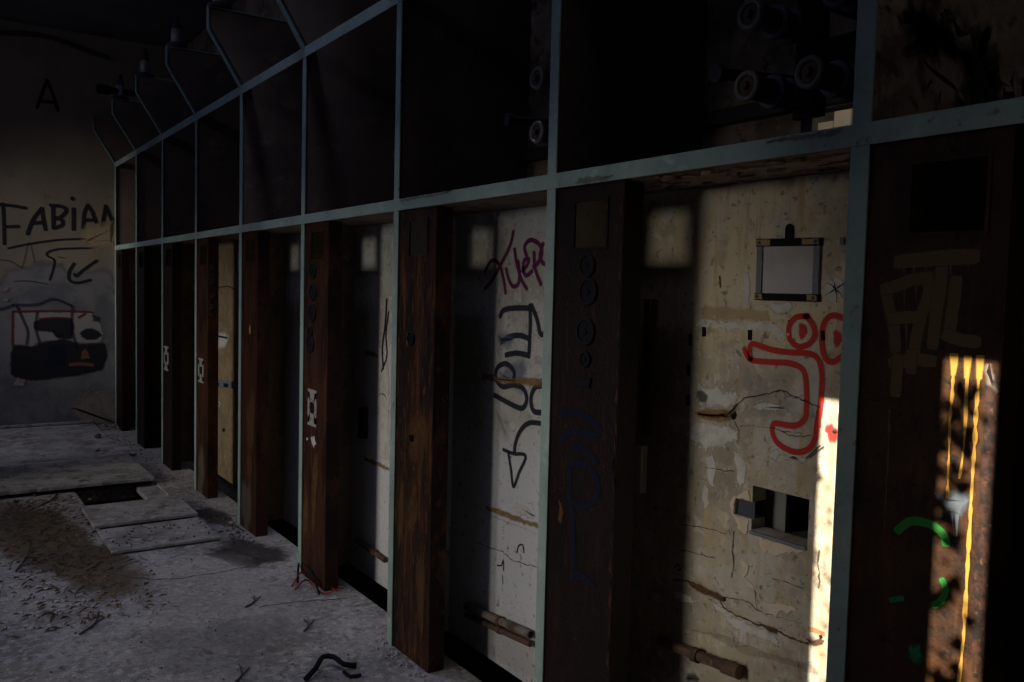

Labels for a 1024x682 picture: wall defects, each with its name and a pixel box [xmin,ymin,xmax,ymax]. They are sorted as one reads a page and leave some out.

peeling [687,373,806,556]
crack [705,390,820,472]
crack [674,524,824,645]